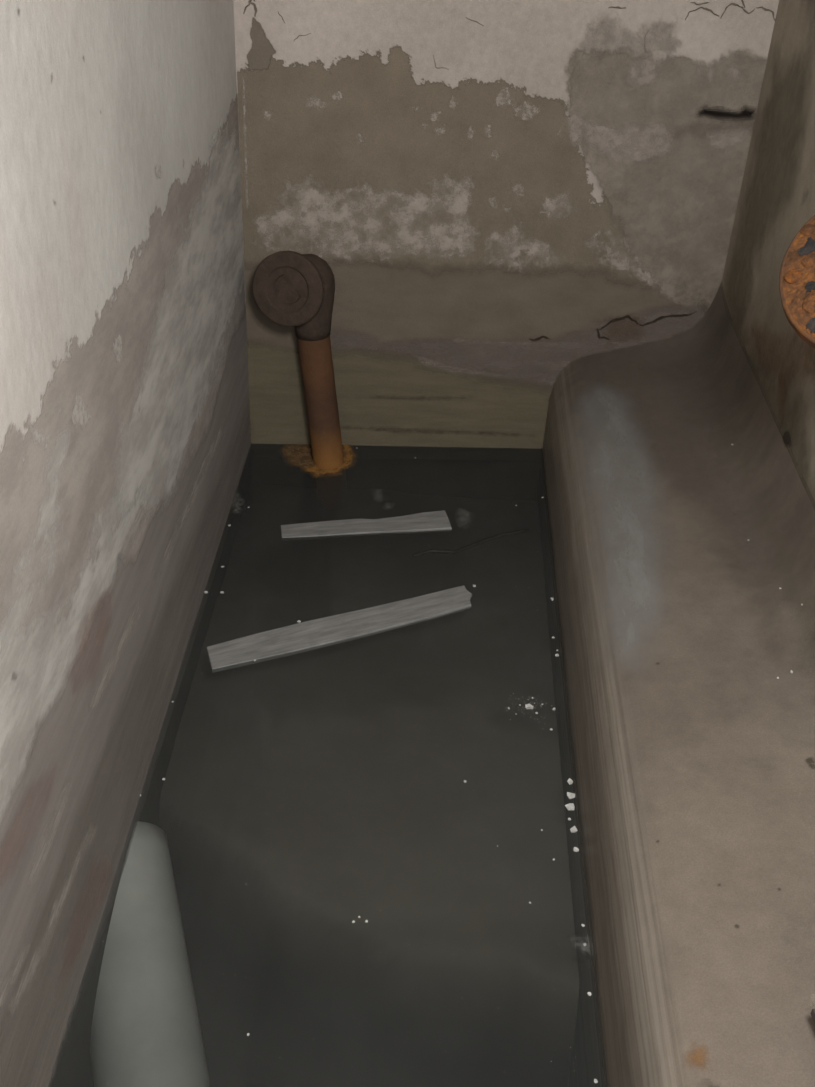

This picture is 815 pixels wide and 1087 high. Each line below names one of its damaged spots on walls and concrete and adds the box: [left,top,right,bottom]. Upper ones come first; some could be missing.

water stain [0,265,311,1087]
peeling [0,22,767,833]
water stain [256,176,709,1087]
crack [596,311,697,340]
crack [685,0,776,21]
corrosion [782,217,815,337]